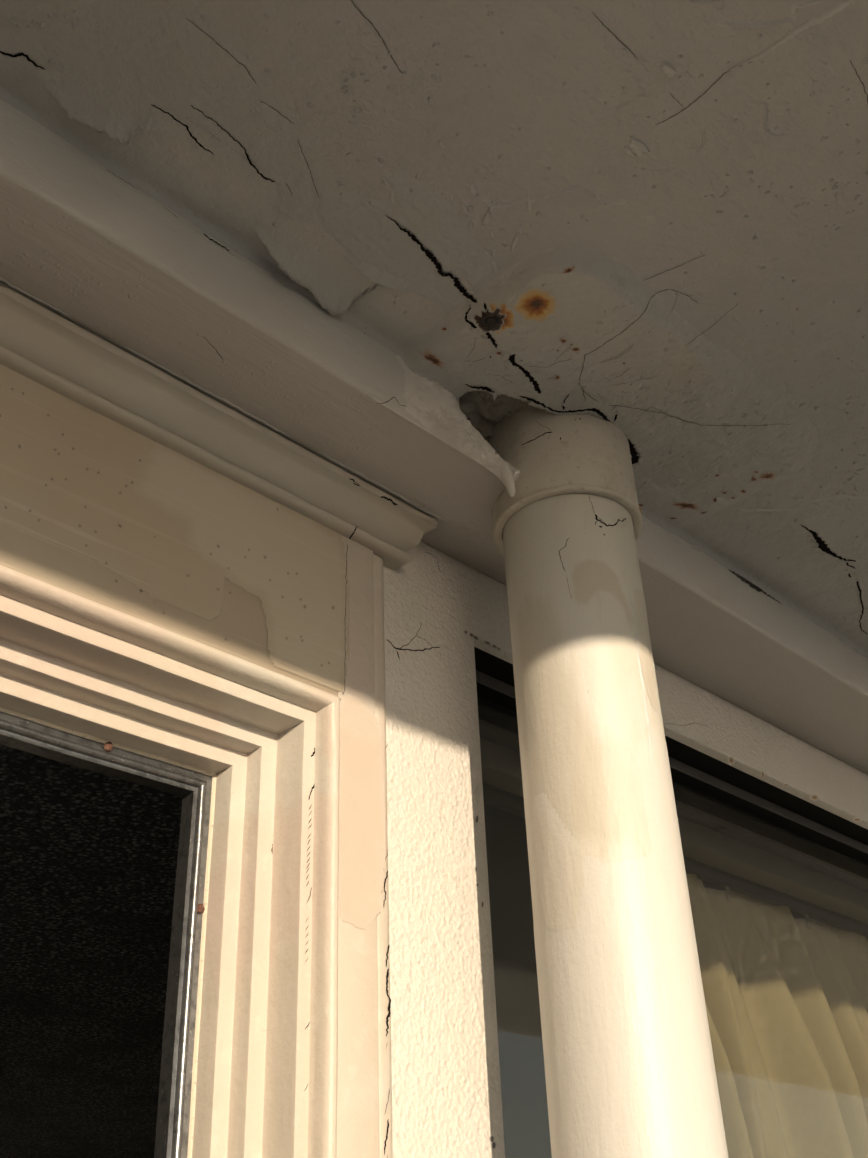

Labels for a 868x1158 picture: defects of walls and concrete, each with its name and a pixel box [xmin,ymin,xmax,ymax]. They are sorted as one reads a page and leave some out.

crack [0,51,45,70]
crack [152,19,319,198]
peeling [21,66,446,351]
corrosion [472,287,559,336]
crack [385,215,789,464]
crack [589,496,626,535]
crack [799,524,868,635]
crack [386,622,441,660]
crack [381,849,389,905]
crack [384,946,392,1047]
crack [383,1088,391,1158]